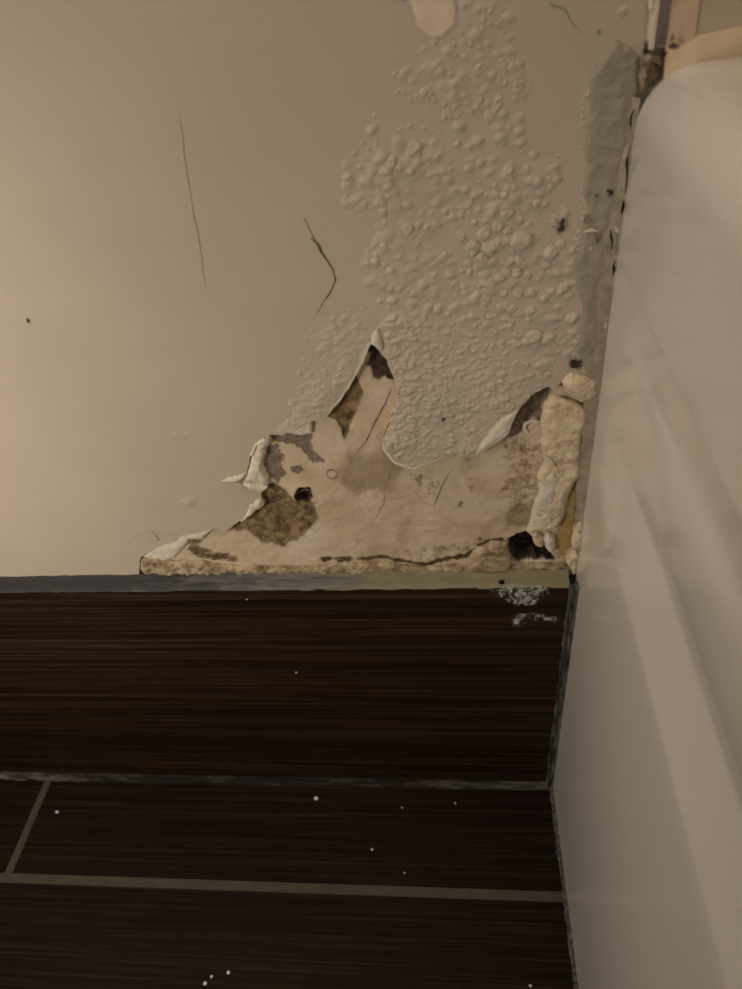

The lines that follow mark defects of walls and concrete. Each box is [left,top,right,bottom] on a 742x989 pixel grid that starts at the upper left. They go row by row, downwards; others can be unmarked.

peeling [410,0,457,38]
crack [304,218,336,314]
flaking render [140,316,597,584]